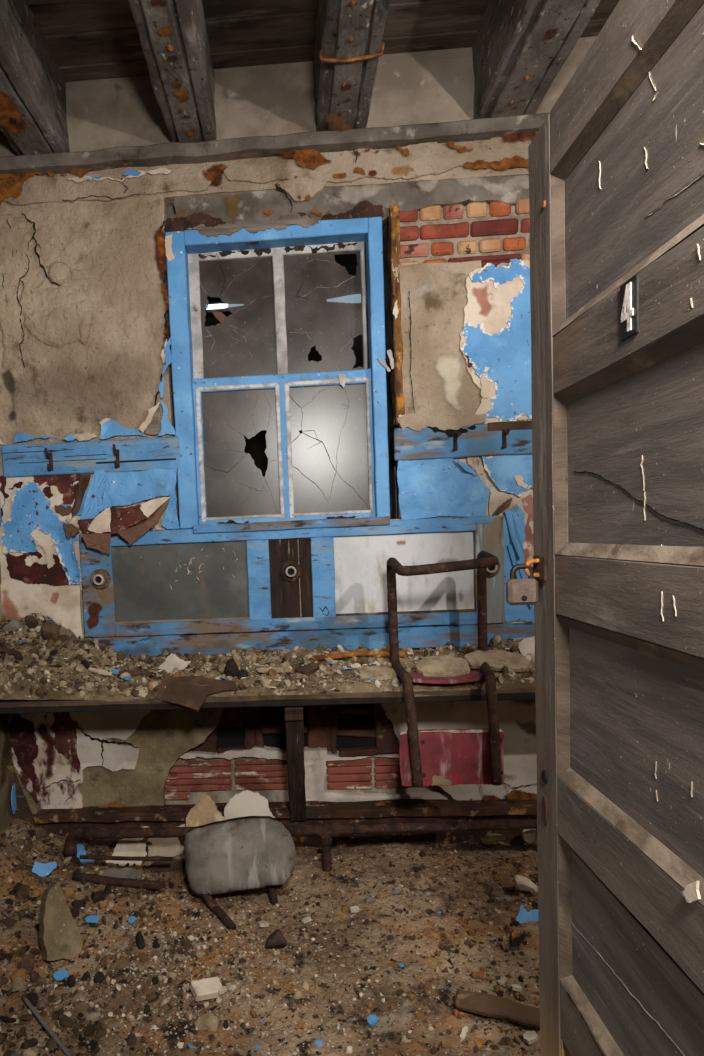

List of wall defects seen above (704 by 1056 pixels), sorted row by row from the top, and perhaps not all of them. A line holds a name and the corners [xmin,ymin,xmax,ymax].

corrosion [0,92,25,134]
crack [2,213,61,367]
flaking render [3,137,533,424]
peeling [0,337,175,445]
peeling [0,468,180,638]
peeling [397,454,534,624]
crack [574,471,704,532]
crack [572,923,686,1056]